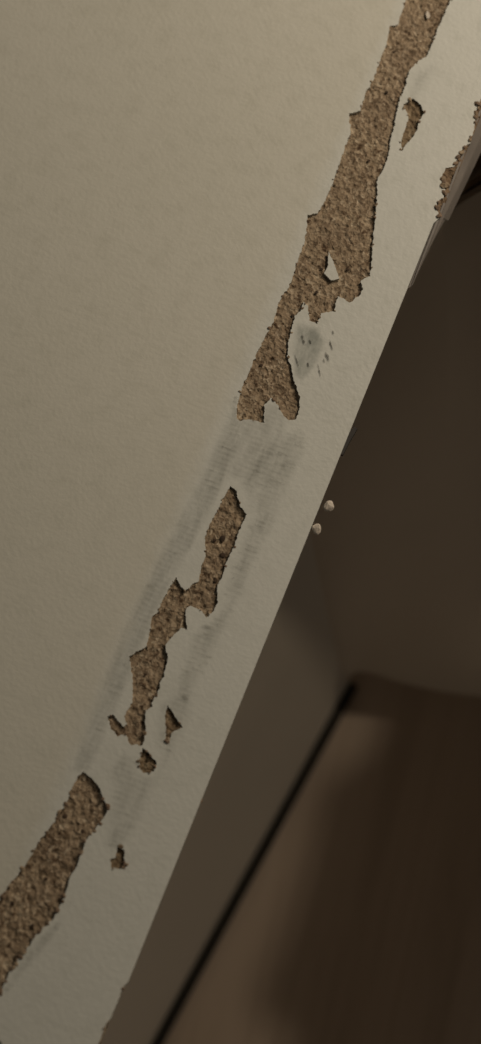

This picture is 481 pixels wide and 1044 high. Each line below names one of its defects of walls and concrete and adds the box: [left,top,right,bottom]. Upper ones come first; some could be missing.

peeling [236,0,450,423]
spalling [434,100,481,218]
peeling [108,488,246,773]
peeling [0,772,110,996]
peeling [110,844,129,870]